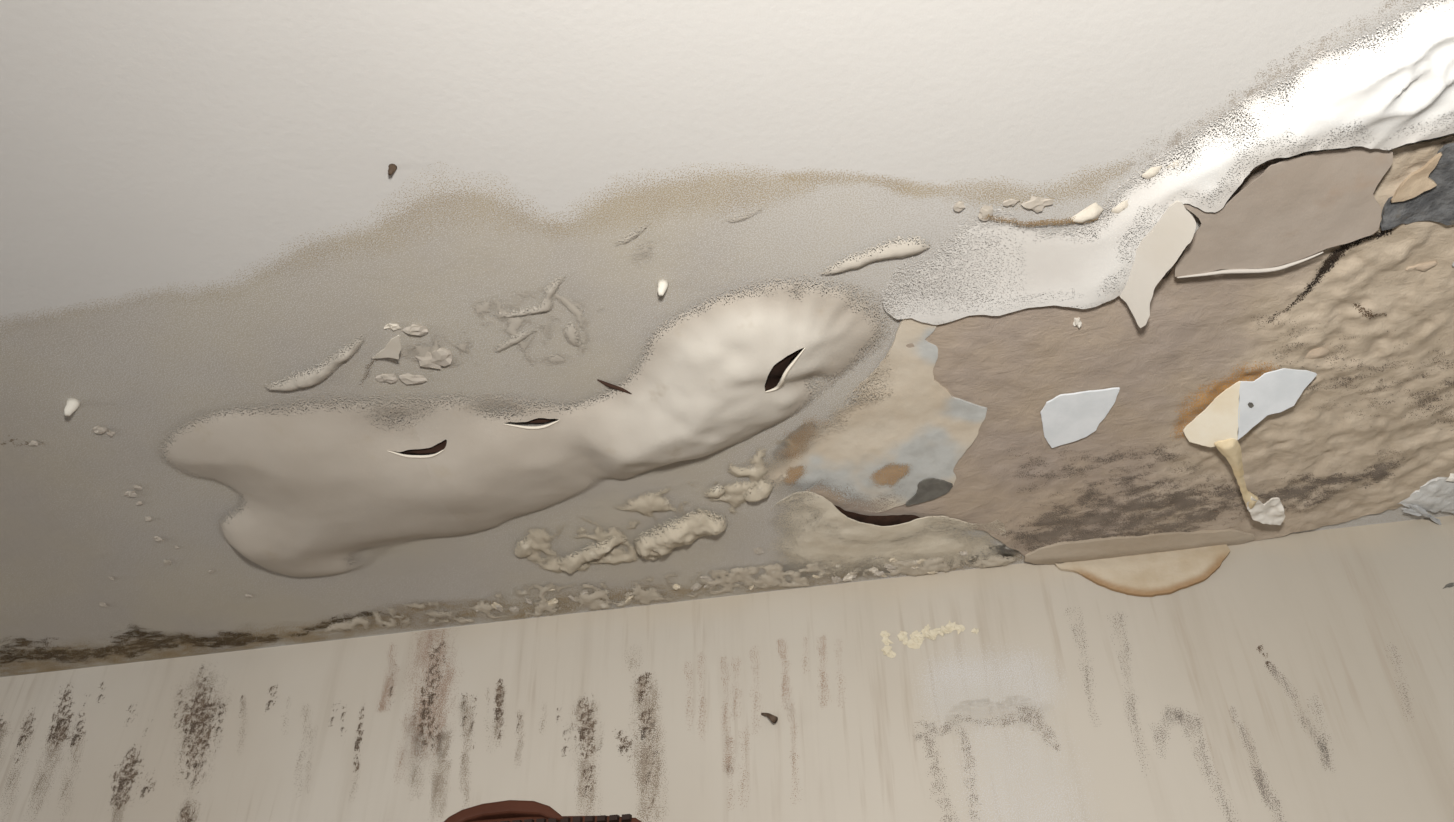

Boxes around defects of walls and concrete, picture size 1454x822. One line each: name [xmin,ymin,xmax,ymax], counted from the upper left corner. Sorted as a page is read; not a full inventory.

water stain [1380,127,1454,231]
flaking render [323,0,1454,634]
water stain [1244,309,1454,431]
water stain [930,441,1407,572]
water stain [799,557,908,587]
water stain [0,681,106,822]
water stain [109,721,156,822]
water stain [164,661,232,793]
water stain [330,703,364,801]
water stain [484,679,508,749]
water stain [538,645,670,822]
water stain [1256,644,1335,771]